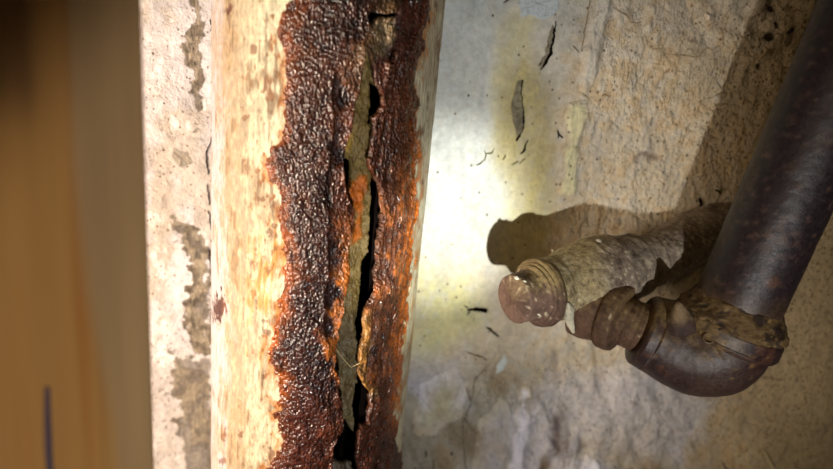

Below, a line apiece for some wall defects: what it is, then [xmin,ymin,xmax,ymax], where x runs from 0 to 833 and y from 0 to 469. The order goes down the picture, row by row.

peeling [511,81,525,135]